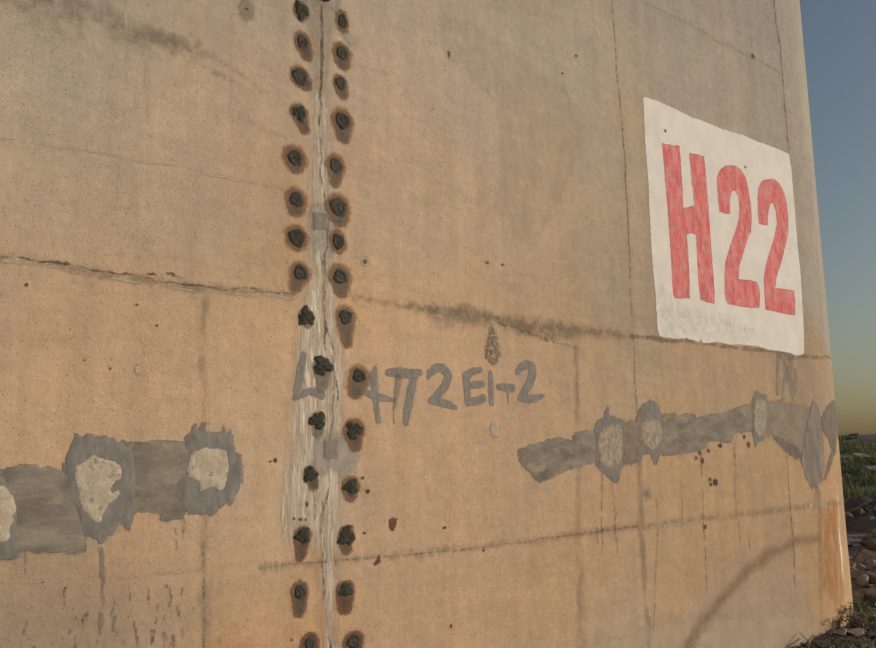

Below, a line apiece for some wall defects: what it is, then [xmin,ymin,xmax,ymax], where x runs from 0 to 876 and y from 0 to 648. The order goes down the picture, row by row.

crack [319,2,339,432]
crack [1,257,294,300]
crack [497,316,598,342]